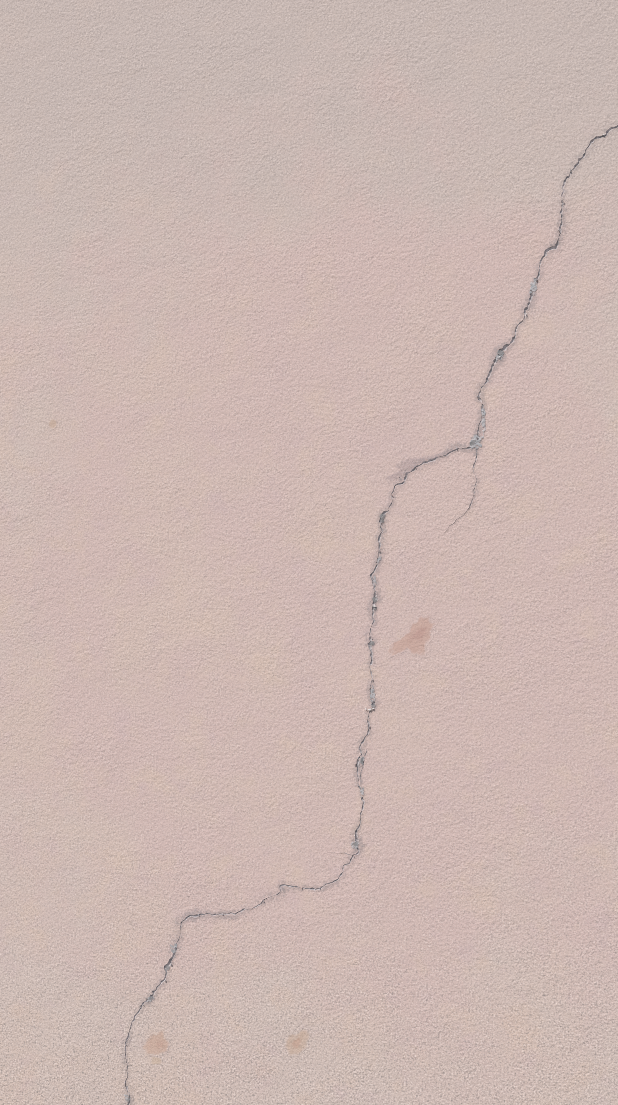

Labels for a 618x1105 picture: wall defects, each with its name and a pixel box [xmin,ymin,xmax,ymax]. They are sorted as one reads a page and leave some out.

crack [124,124,618,1105]